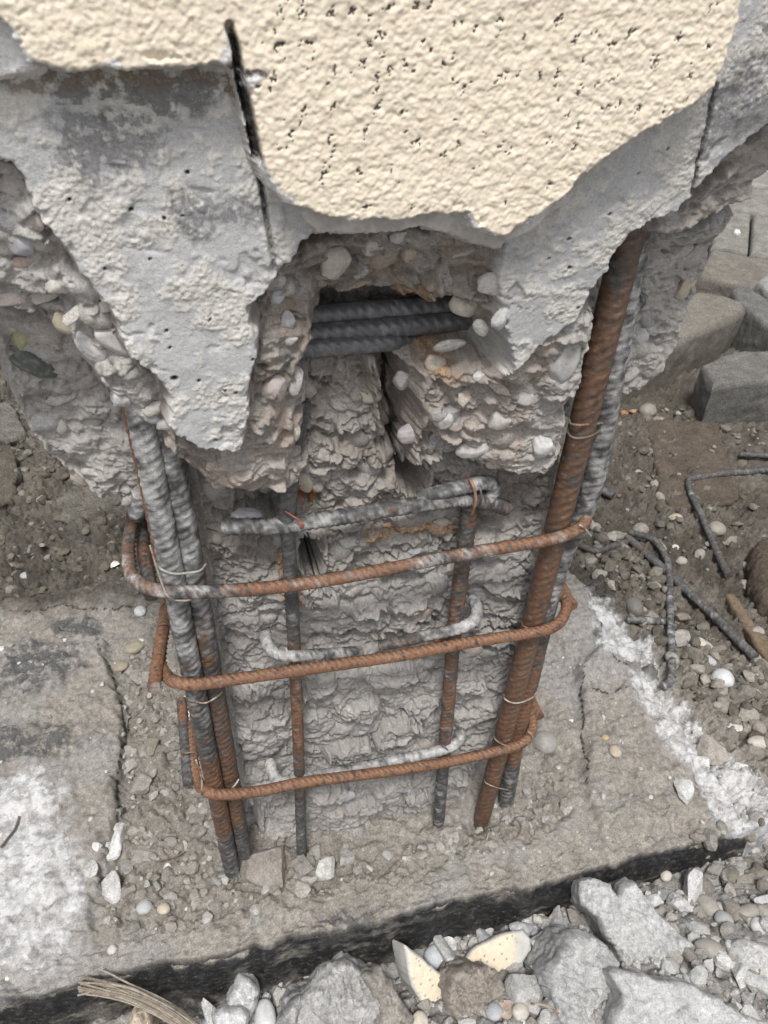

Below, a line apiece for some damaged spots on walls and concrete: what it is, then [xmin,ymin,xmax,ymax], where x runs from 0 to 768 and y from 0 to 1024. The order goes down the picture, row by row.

flaking render [219,28,276,92]
hole [350,31,415,115]
corrosion [412,334,457,384]
spalling [0,123,768,857]
crack [96,639,132,822]
spalling [163,599,251,882]
leakage [583,584,768,853]